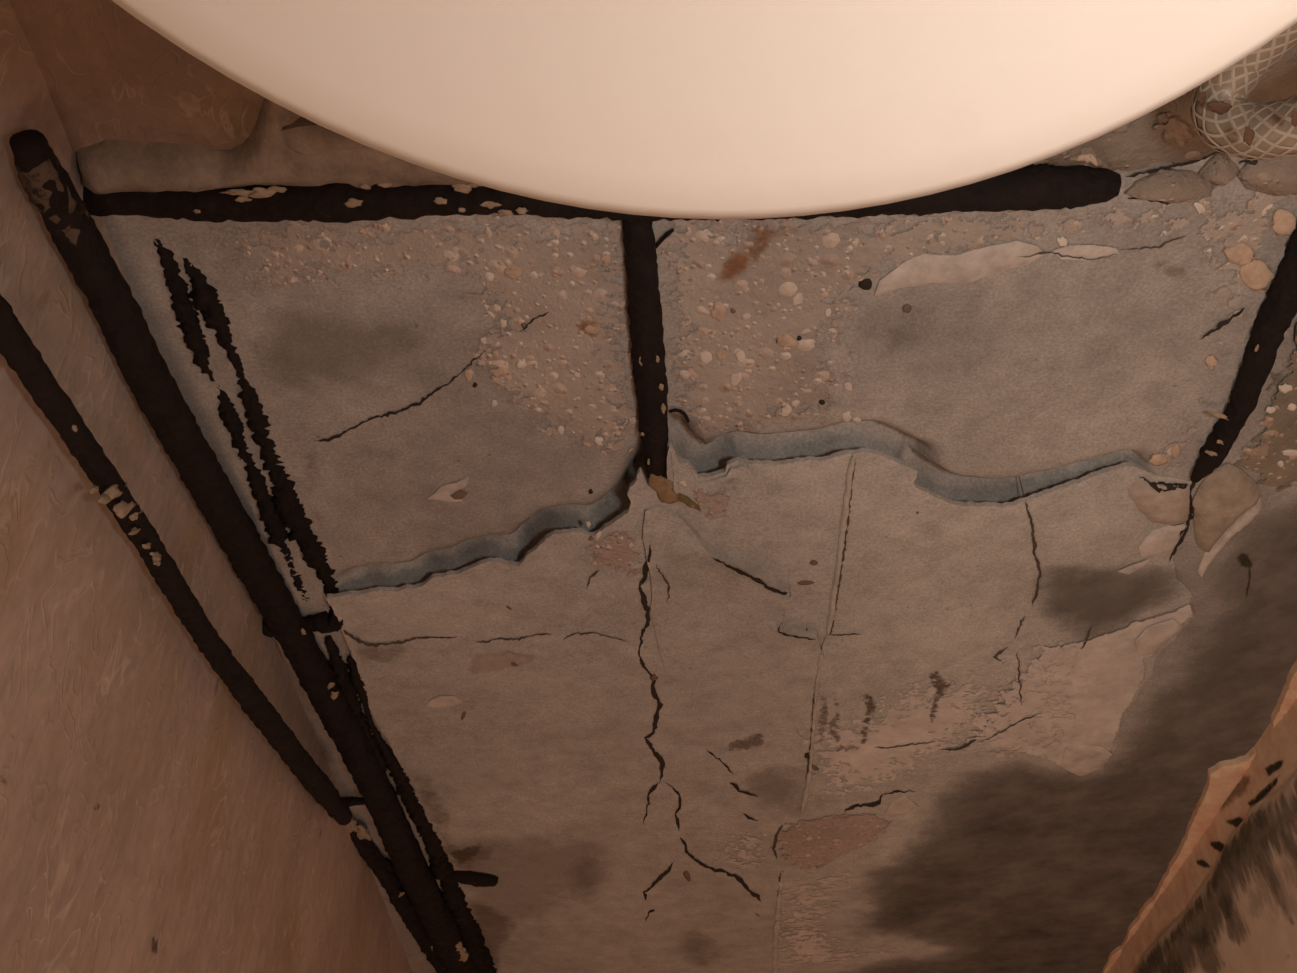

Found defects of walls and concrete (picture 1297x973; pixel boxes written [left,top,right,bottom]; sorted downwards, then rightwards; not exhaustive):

spalling [1249,44,1297,103]
flaking render [76,98,474,194]
spalling [1033,88,1225,171]
rust [1243,125,1255,146]
rust [723,231,769,278]
spalling [207,213,639,461]
spalling [655,191,1297,439]
crack [318,352,484,442]
spalling [1197,324,1297,577]
crack [1139,477,1196,562]
crack [343,545,761,919]
water stain [771,511,1297,973]